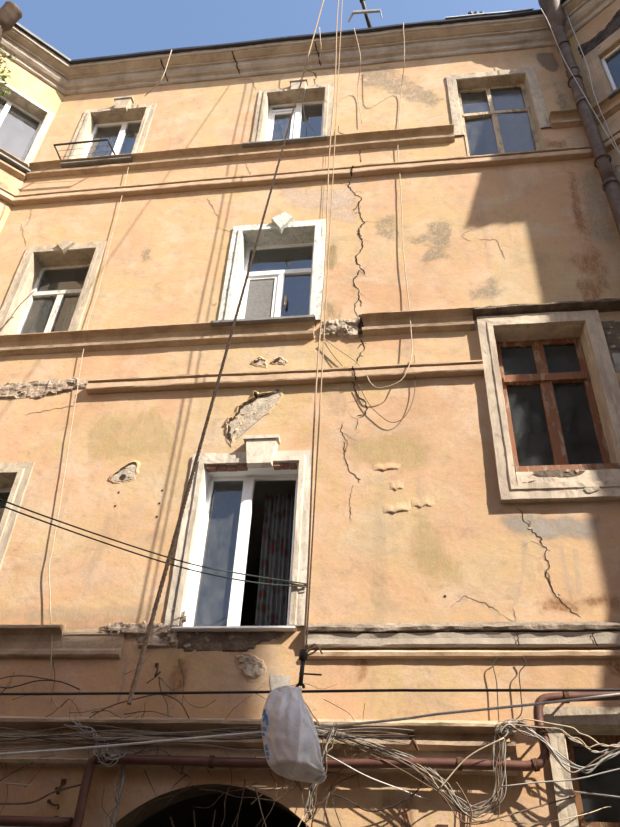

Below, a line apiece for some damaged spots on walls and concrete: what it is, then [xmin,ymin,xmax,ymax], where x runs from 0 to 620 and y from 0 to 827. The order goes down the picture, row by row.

spalling [250,356,289,369]
crack [336,150,370,519]
spalling [601,320,620,355]
spalling [224,388,285,448]
spalling [107,460,141,484]
crack [516,507,580,617]
spalling [162,606,286,683]
crack [450,595,521,650]